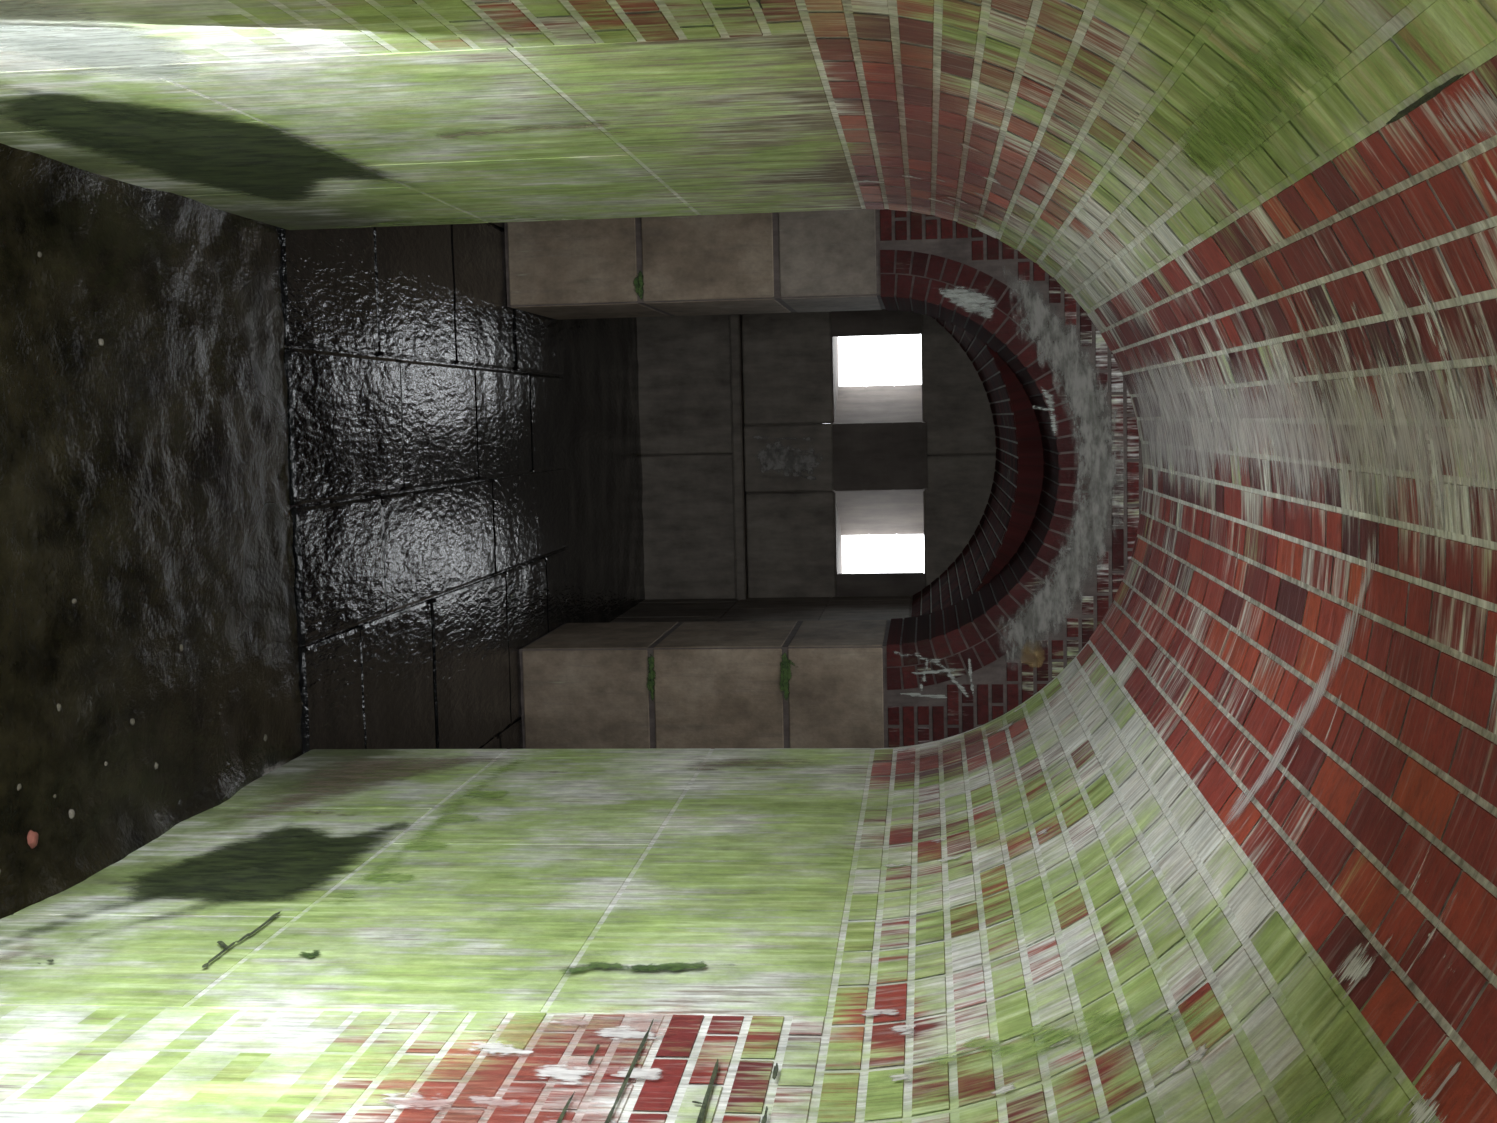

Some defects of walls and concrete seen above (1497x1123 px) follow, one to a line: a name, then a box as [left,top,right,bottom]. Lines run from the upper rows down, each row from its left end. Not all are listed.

water stain [0,1,198,78]
water stain [0,94,399,201]
water stain [1438,86,1497,154]
water stain [941,289,994,318]
water stain [1132,258,1497,528]
water stain [1004,280,1123,660]
water stain [1226,541,1375,825]
water stain [105,758,507,906]